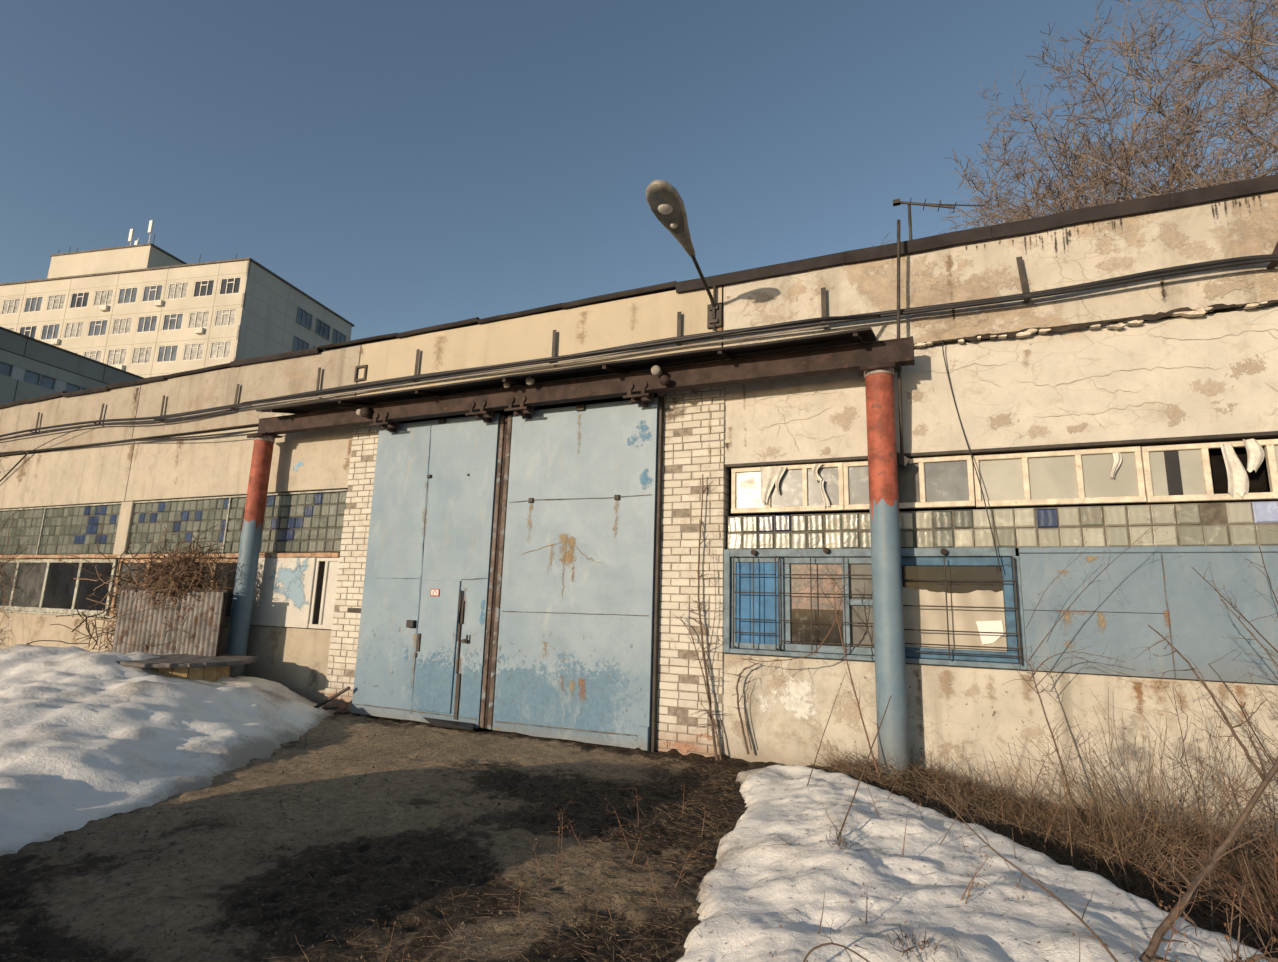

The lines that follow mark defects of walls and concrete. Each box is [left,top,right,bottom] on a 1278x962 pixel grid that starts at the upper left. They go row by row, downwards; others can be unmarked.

leakage [965,222,1094,252]
spalling [913,276,1278,348]
crack [914,329,1277,428]
crack [761,391,849,455]
peeling [270,557,308,608]
corrosion [550,534,575,581]